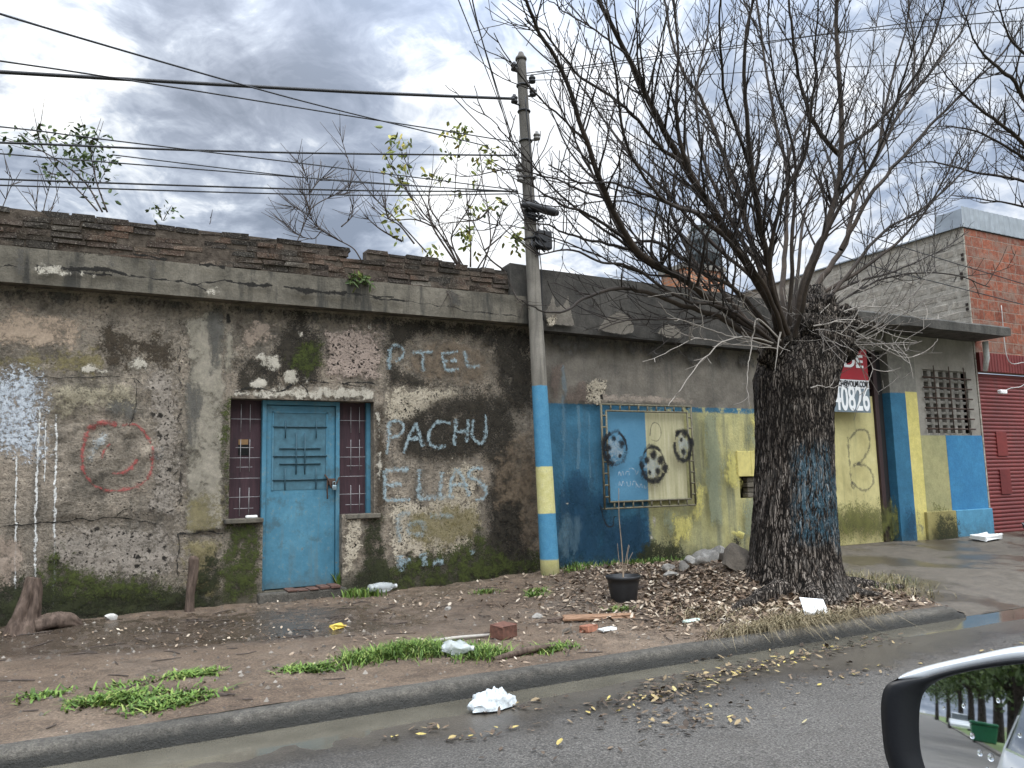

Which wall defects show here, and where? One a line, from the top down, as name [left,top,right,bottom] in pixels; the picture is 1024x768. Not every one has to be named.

spalling [35,265,94,276]
crack [1,253,518,317]
flaking render [236,320,283,388]
flaking render [551,364,692,403]
water stain [207,305,539,573]
crack [0,509,223,576]
water stain [0,409,227,627]